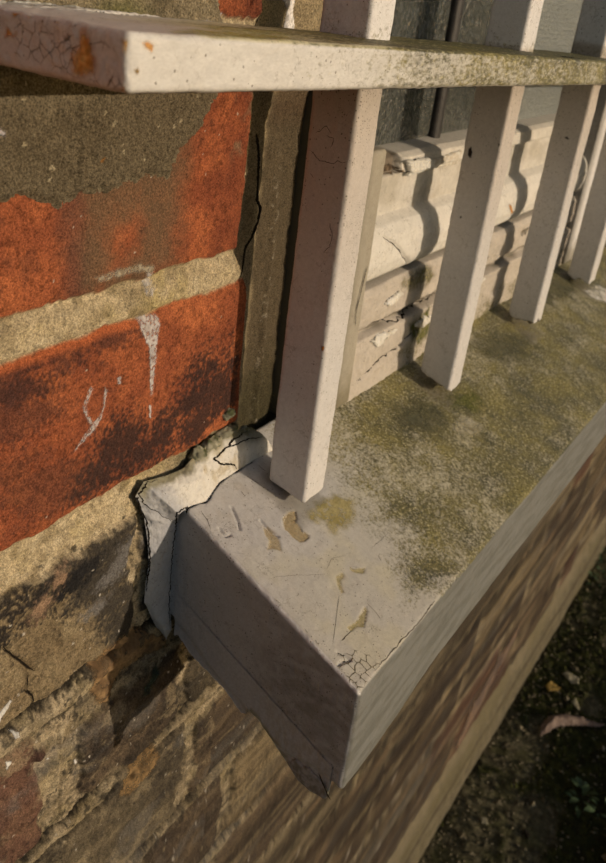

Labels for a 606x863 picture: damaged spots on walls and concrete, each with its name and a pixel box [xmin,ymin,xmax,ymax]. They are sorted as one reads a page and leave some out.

peeling [0,0,159,17]
crack [17,3,104,69]
corrosion [73,34,94,75]
crack [239,134,262,279]
water stain [546,274,574,305]
water stain [585,285,606,302]
peeling [370,328,397,348]
peeling [415,315,431,327]
crack [136,431,264,623]
peeling [283,512,309,542]
crack [338,601,435,688]
peeling [287,758,326,799]